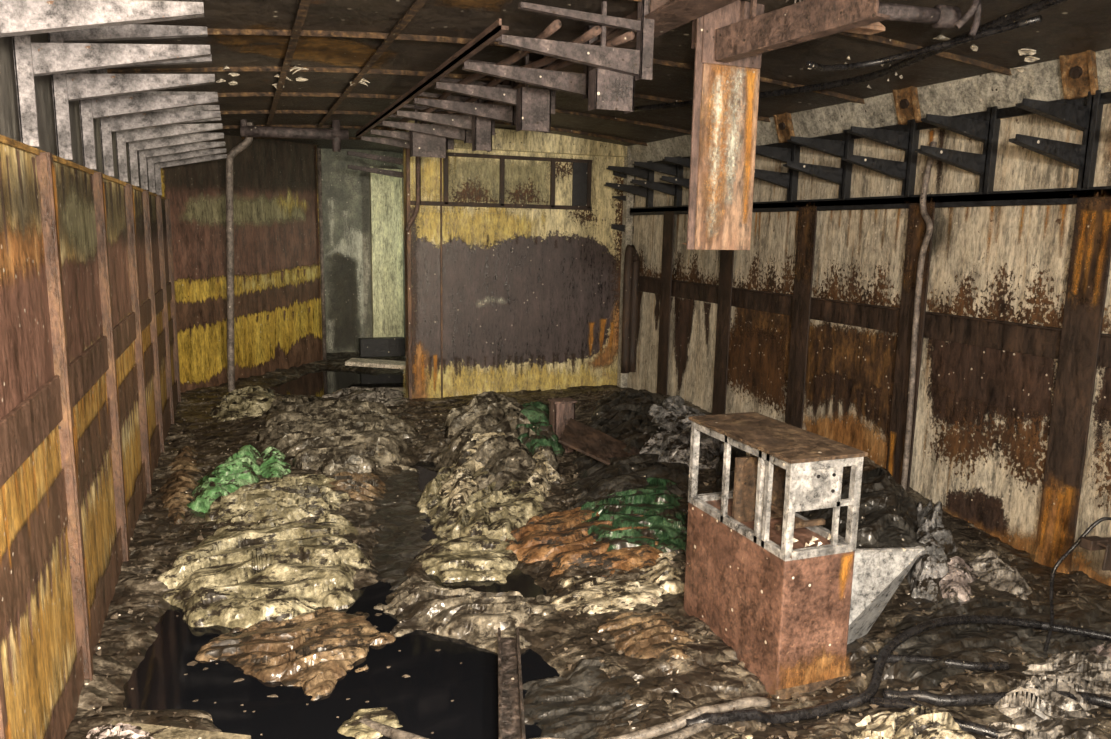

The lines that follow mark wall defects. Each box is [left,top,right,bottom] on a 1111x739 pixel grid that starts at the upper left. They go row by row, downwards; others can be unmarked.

rust [0,150,38,193]
rust [0,209,54,419]
damp [405,230,620,379]
rust [406,156,624,399]
rust [637,291,717,394]
rust [639,248,719,285]
rust [704,65,1111,334]
rust [924,338,1111,586]
rust [840,555,853,593]
rust [780,653,848,689]